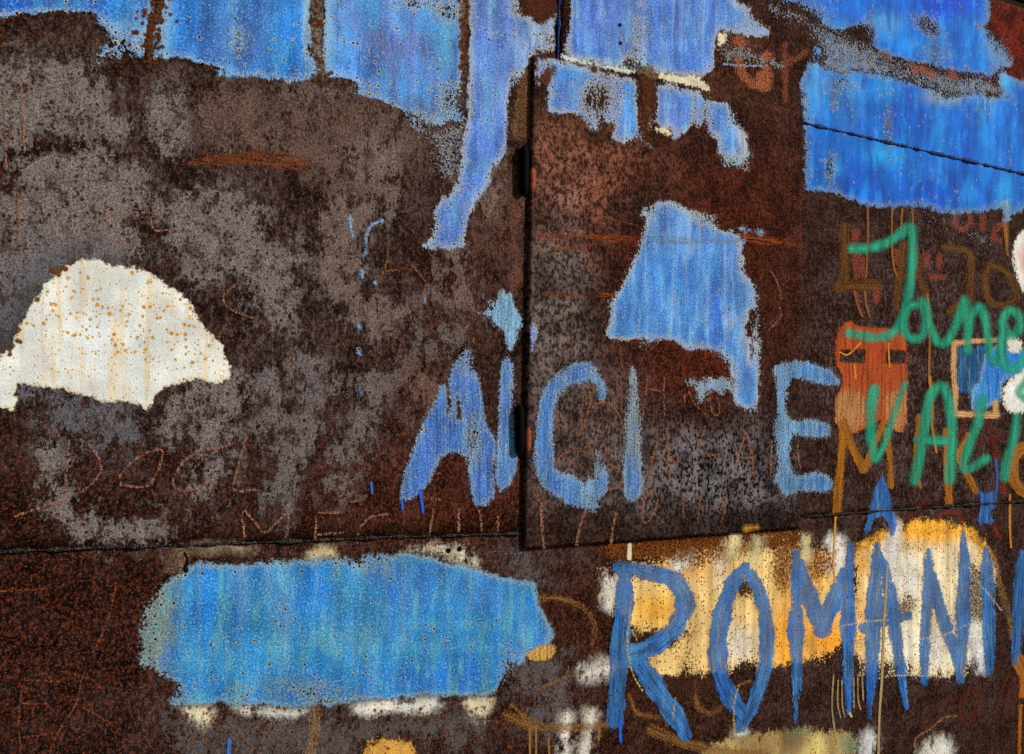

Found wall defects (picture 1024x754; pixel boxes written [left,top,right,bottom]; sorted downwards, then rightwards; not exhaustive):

rust [128,0,179,72]
rust [309,0,333,87]
rust [510,64,557,143]
peeling [534,58,548,86]
peeling [561,53,635,74]
rust [636,64,658,142]
peeling [658,72,710,91]
peeling [717,32,785,70]
peeling [768,2,1002,97]
rust [189,149,311,170]
rust [3,261,214,369]
rust [162,546,190,575]